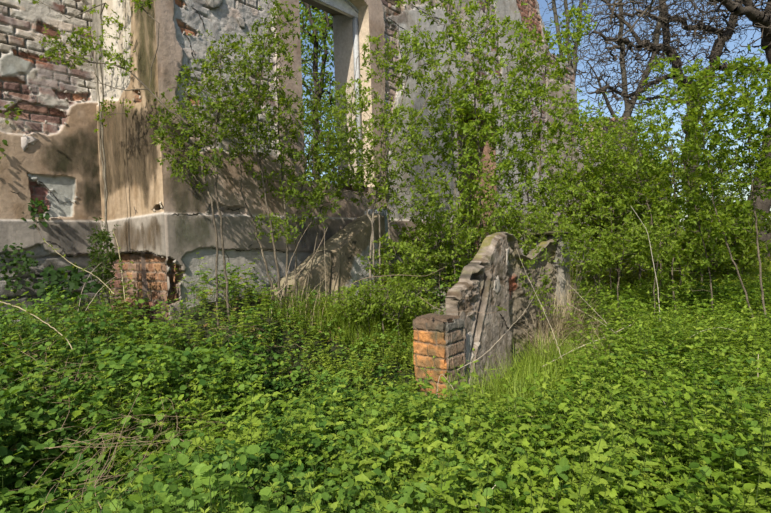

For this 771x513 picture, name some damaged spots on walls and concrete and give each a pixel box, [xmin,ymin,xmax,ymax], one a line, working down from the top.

spalling [36,20,63,42]
spalling [175,18,200,37]
spalling [516,0,543,43]
spalling [11,48,49,65]
spalling [0,75,92,125]
spalling [27,172,78,218]
water stain [47,103,159,252]
spalling [117,251,185,305]